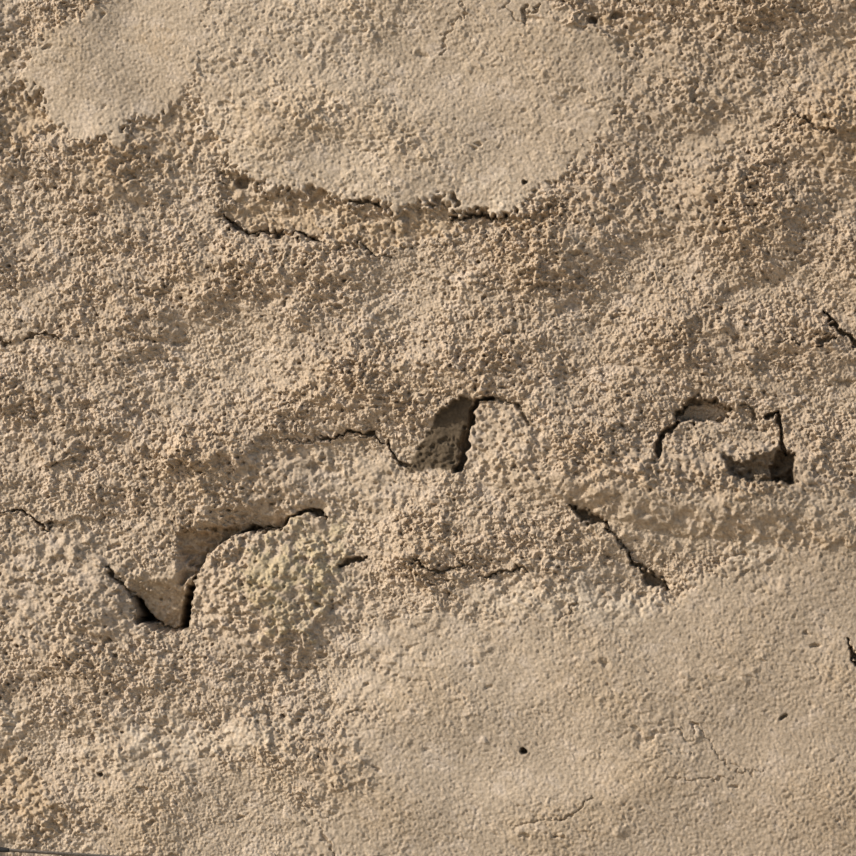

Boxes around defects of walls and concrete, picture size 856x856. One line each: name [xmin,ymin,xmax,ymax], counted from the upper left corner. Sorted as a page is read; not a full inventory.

crack [348,198,382,208]
crack [449,192,508,224]
crack [222,213,324,246]
crack [356,239,393,259]
crack [775,310,856,348]
crack [276,428,384,444]
spalling [386,392,537,476]
crack [0,508,54,532]
crack [568,504,671,591]
crack [105,507,328,635]
crack [412,557,527,578]